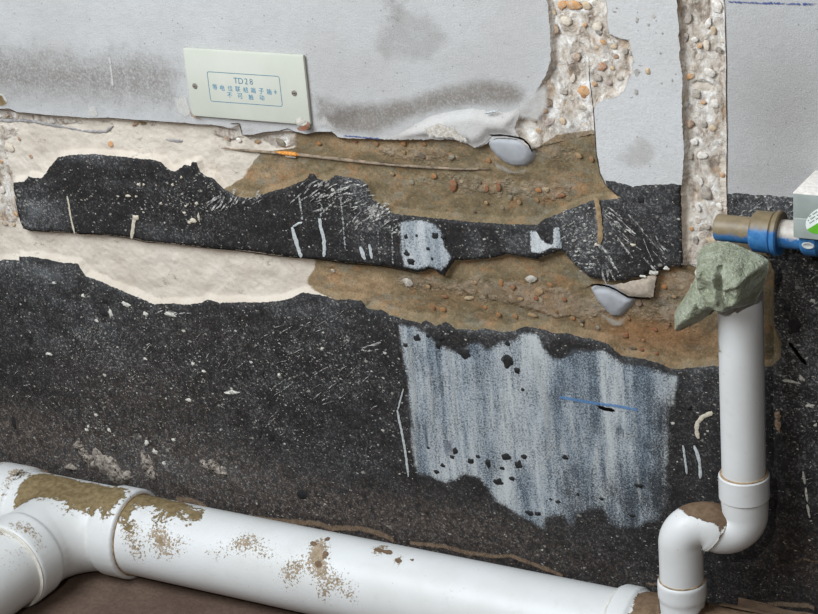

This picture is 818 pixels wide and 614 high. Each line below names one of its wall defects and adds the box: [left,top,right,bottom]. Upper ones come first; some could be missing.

spalling [222,147,489,171]
leakage [315,85,546,129]
peeling [515,0,727,275]
leakage [399,325,677,527]